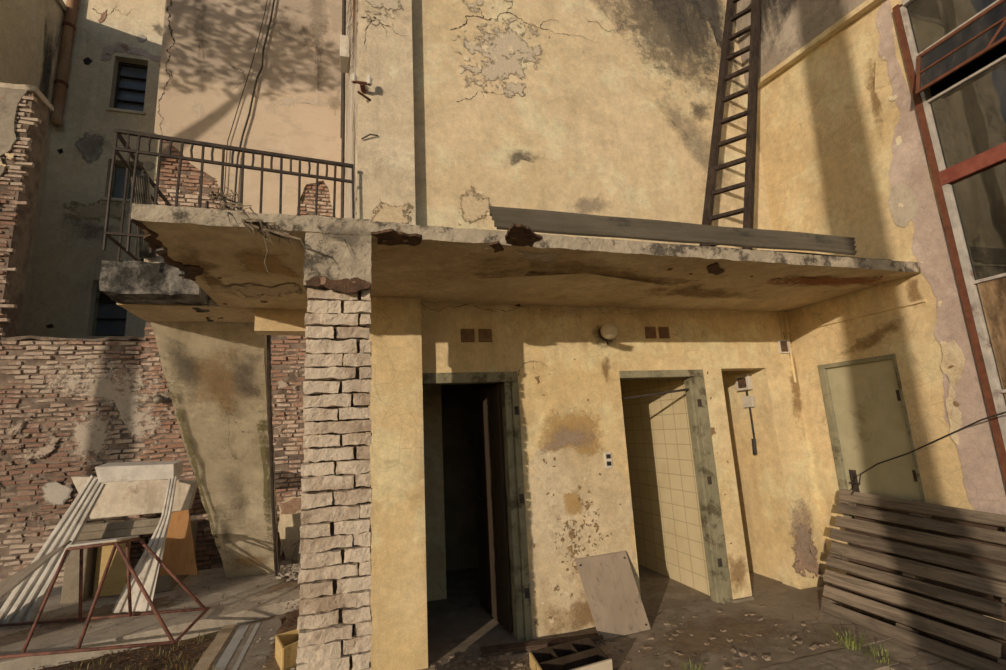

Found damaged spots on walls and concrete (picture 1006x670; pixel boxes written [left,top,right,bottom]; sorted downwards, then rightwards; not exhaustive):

water stain [760,0,794,32]
crack [158,0,175,132]
peeling [451,0,550,98]
water stain [617,0,724,90]
peeling [367,202,422,246]
peeling [458,186,492,226]
corrosion [768,276,885,288]
water stain [169,341,255,413]
water stain [564,492,582,514]